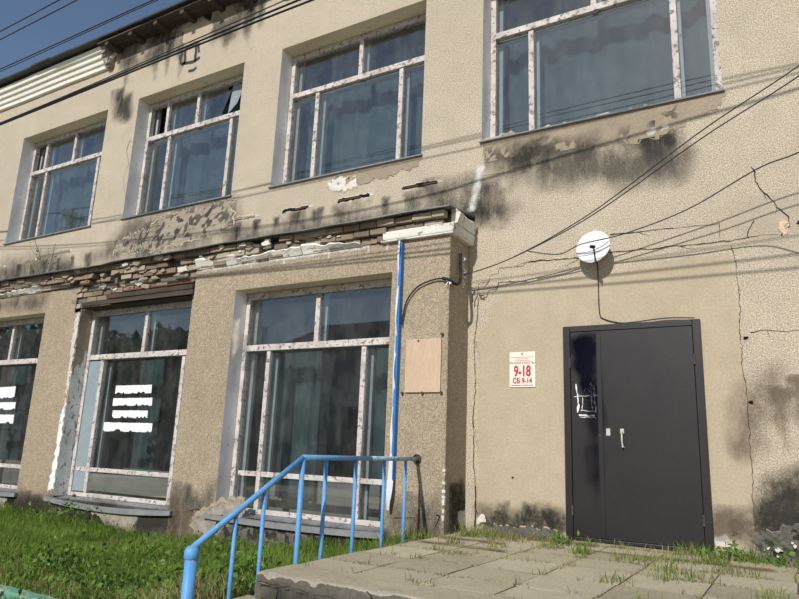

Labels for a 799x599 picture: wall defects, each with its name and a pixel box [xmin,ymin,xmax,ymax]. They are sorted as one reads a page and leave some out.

damp [213,0,264,40]
damp [116,88,131,120]
spalling [481,92,728,164]
spalling [326,156,423,204]
spalling [401,179,443,191]
damp [452,166,505,220]
damp [490,133,688,180]
flaking render [0,197,448,492]
crack [607,167,795,515]
spalling [441,236,451,529]
damp [769,375,799,420]
spalling [90,511,140,535]